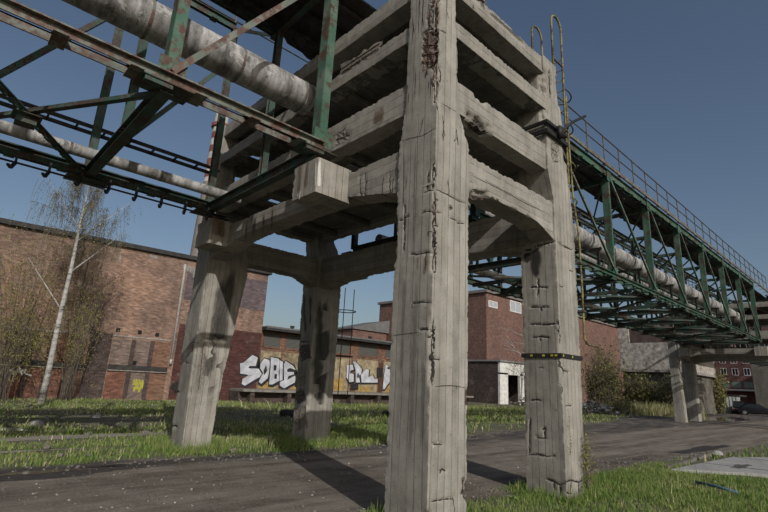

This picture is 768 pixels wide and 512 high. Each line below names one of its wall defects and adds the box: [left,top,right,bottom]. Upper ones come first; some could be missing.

spalling [421,0,439,87]
spalling [468,118,488,135]
water stain [524,249,541,276]
water stain [206,274,234,376]
water stain [303,298,329,405]
crack [530,270,573,406]
crack [529,422,554,457]
crack [548,479,582,494]